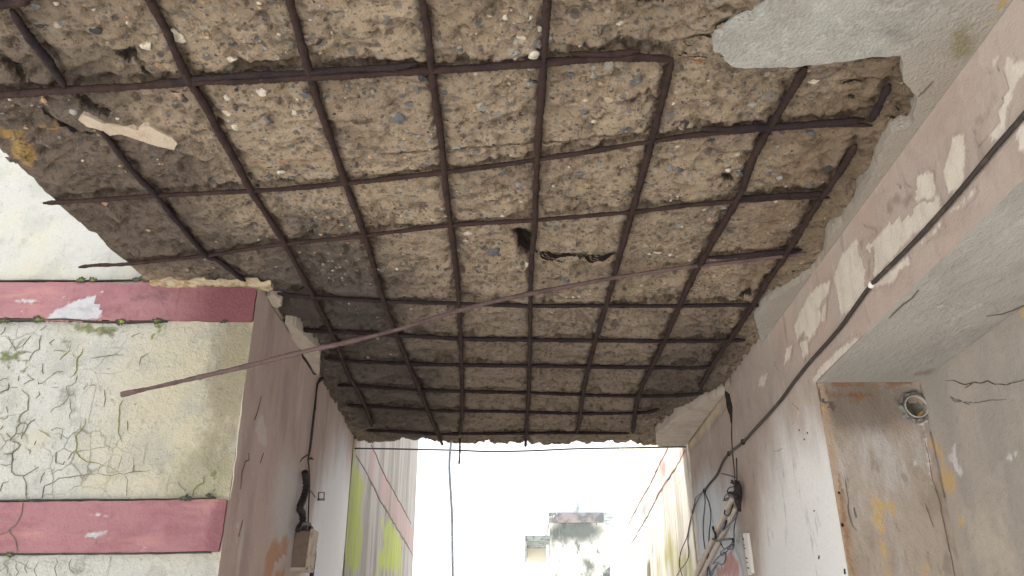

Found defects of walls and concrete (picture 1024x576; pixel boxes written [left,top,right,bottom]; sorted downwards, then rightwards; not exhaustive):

rust [238,148,335,167]
spalling [0,0,914,500]
crack [529,237,616,264]
peeling [783,131,978,368]
rust [819,382,920,407]
crack [948,380,1023,405]
crack [0,325,151,576]